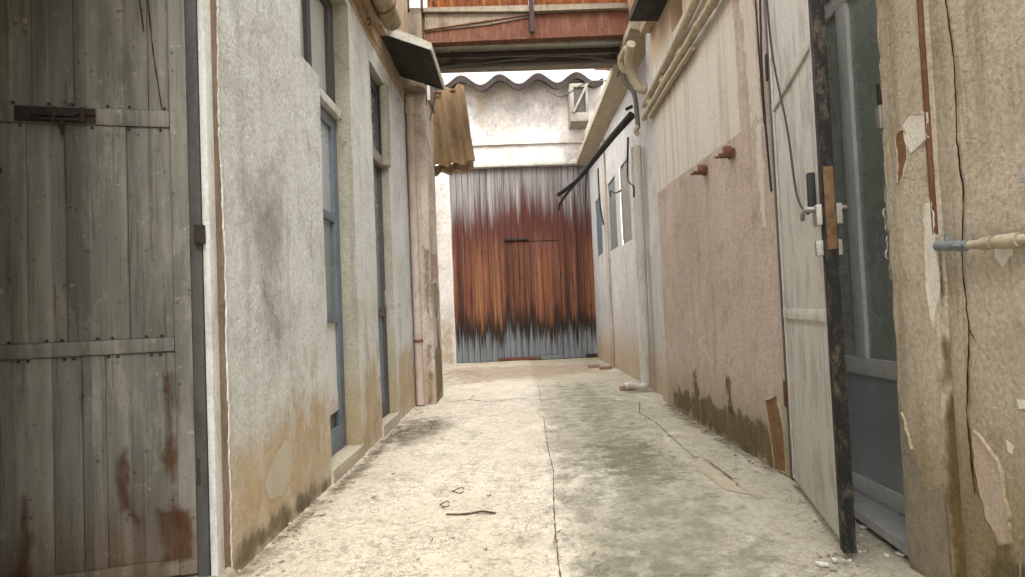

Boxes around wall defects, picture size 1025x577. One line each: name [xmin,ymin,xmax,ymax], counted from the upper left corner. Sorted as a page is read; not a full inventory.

crack [945,0,976,492]
rust [164,374,176,481]
leakage [666,371,779,472]
rust [116,453,140,525]
rust [158,506,192,562]
leakage [237,407,441,574]
peeling [972,430,1025,577]